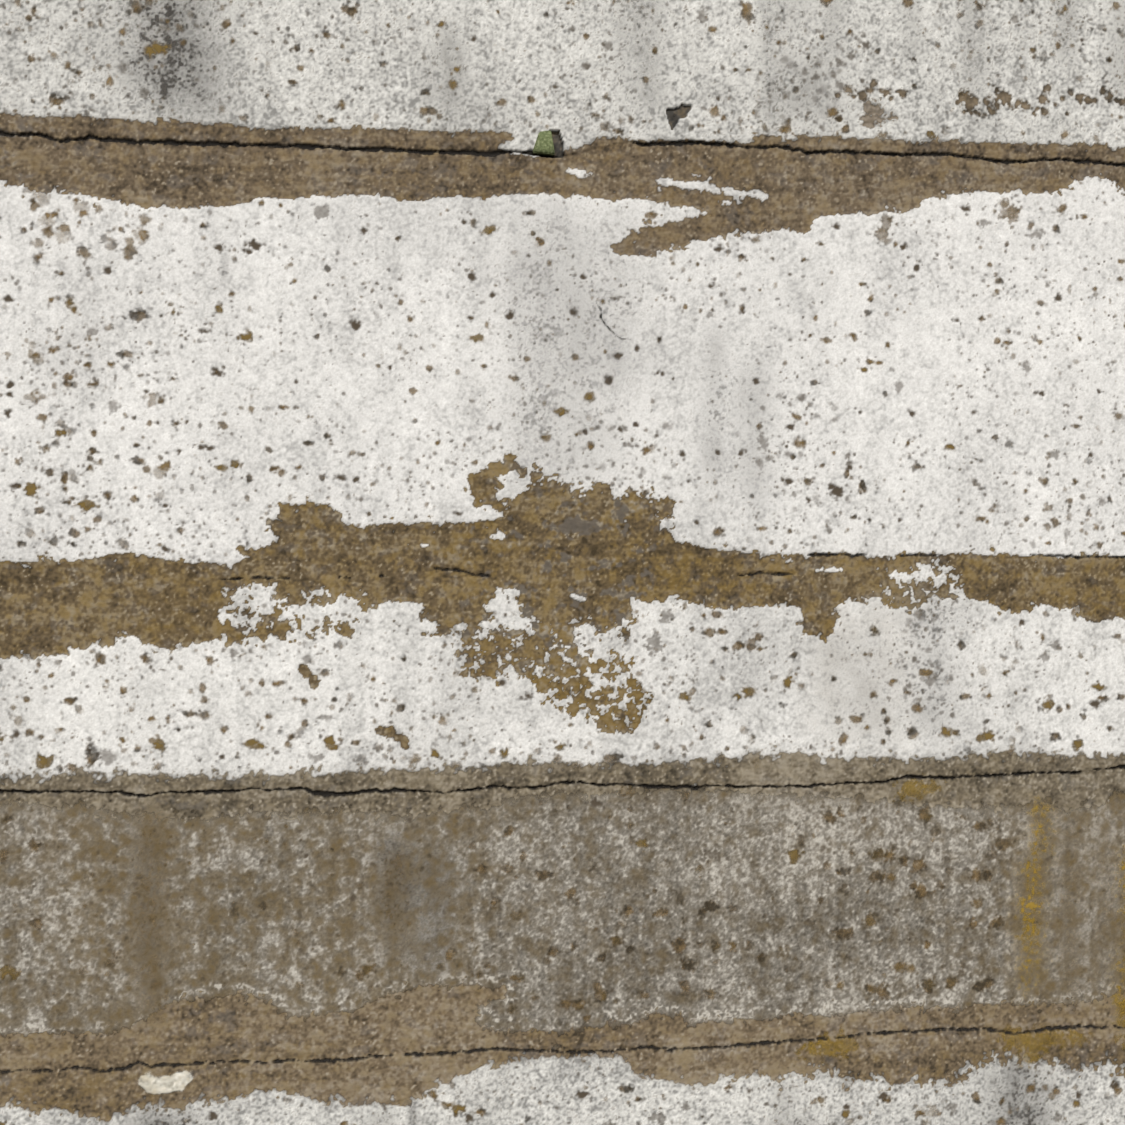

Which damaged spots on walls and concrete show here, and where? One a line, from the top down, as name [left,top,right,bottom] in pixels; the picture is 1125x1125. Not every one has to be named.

crack [0,131,557,158]
peeling [0,79,1125,257]
crack [633,141,1125,167]
peeling [0,453,1125,734]
peeling [0,726,1125,827]
crack [0,765,1125,797]
crack [0,1024,1121,1073]
peeling [0,979,1125,1122]